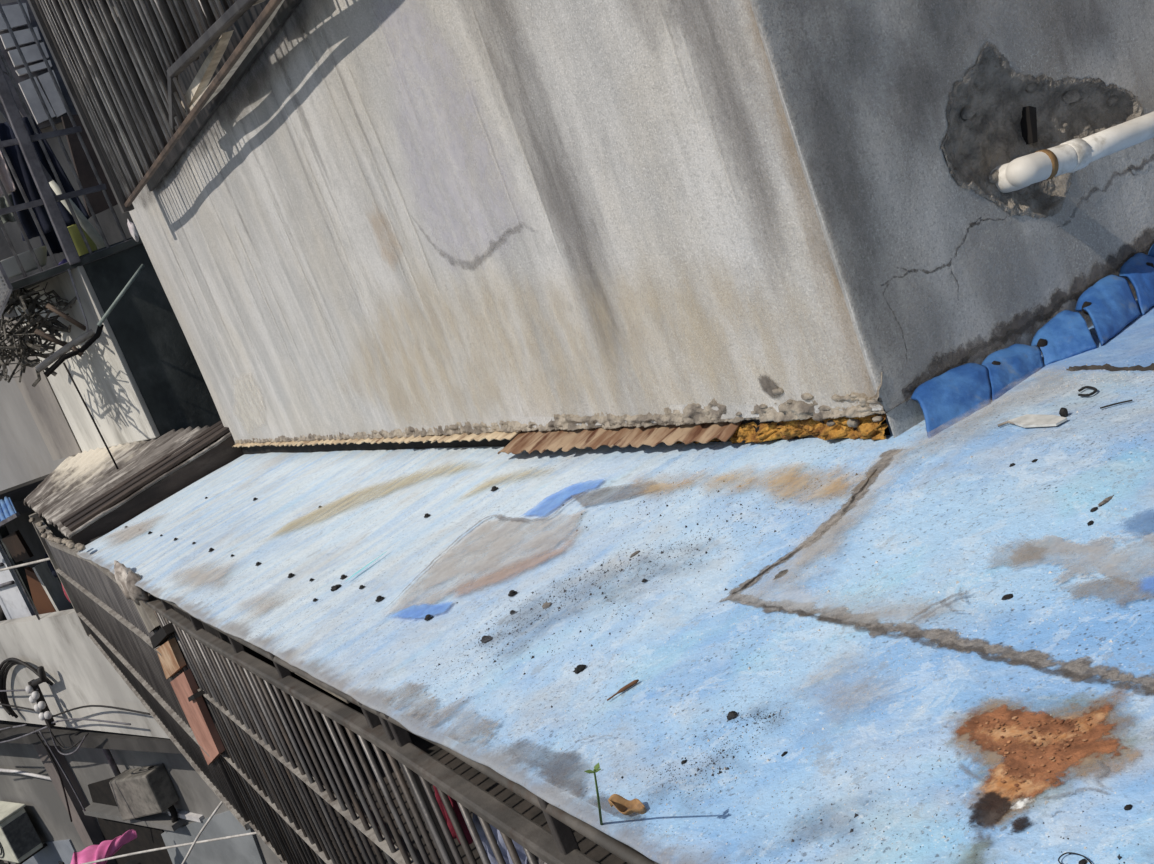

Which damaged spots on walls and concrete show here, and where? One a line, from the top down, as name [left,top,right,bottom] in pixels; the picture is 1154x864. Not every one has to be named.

spalling [940,41,1144,219]
crack [1058,155,1154,227]
crack [881,217,994,359]
peeling [391,479,655,619]
damp [1124,509,1154,533]
rust [954,692,1139,860]